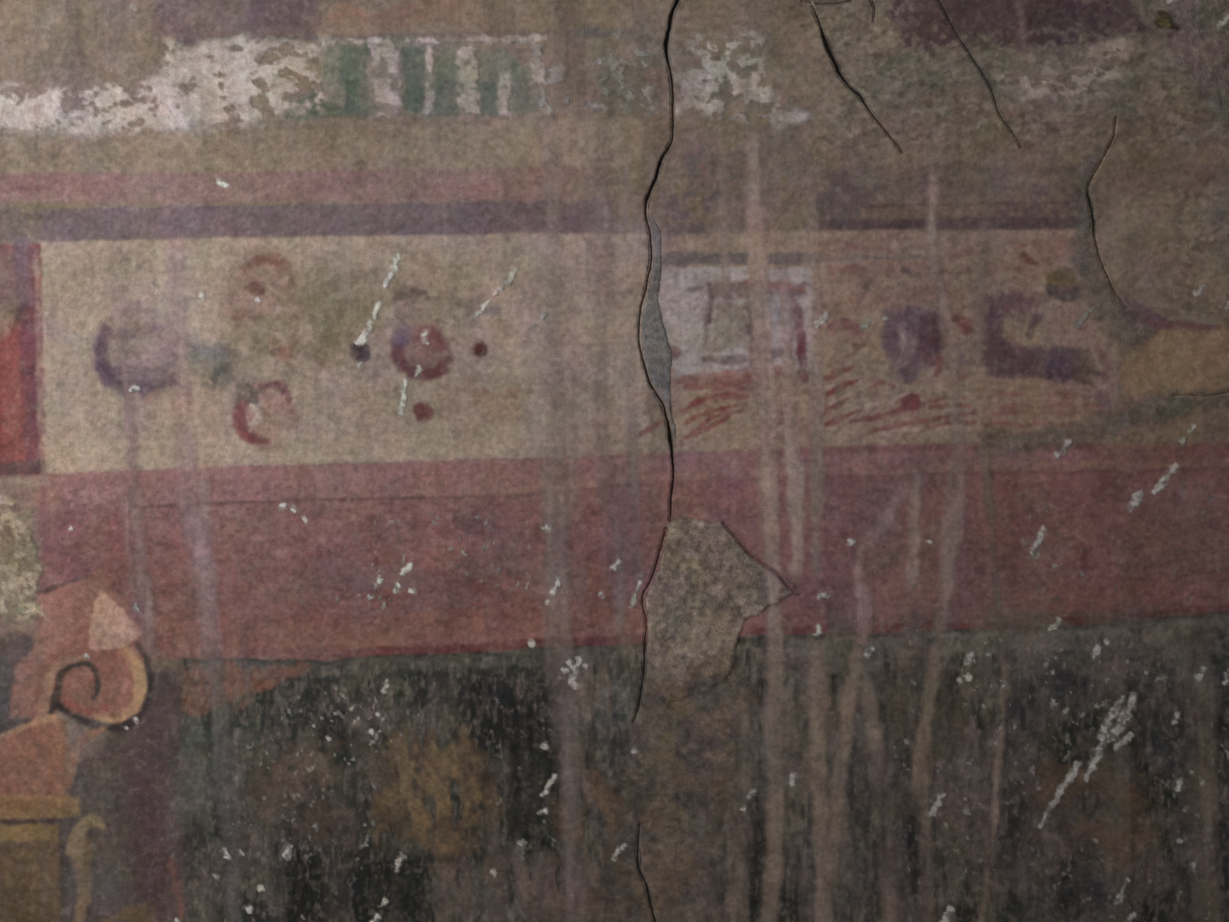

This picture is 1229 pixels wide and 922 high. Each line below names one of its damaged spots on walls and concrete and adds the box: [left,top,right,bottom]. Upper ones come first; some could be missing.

peeling [0,33,581,139]
peeling [586,47,660,116]
peeling [676,32,811,131]
crack [802,0,905,153]
crack [937,0,1023,147]
crack [632,0,681,724]
peeling [0,495,43,621]
water stain [746,136,824,922]
water stain [809,476,920,922]
water stain [912,644,939,861]
water stain [991,689,1004,848]
crack [635,825,658,922]